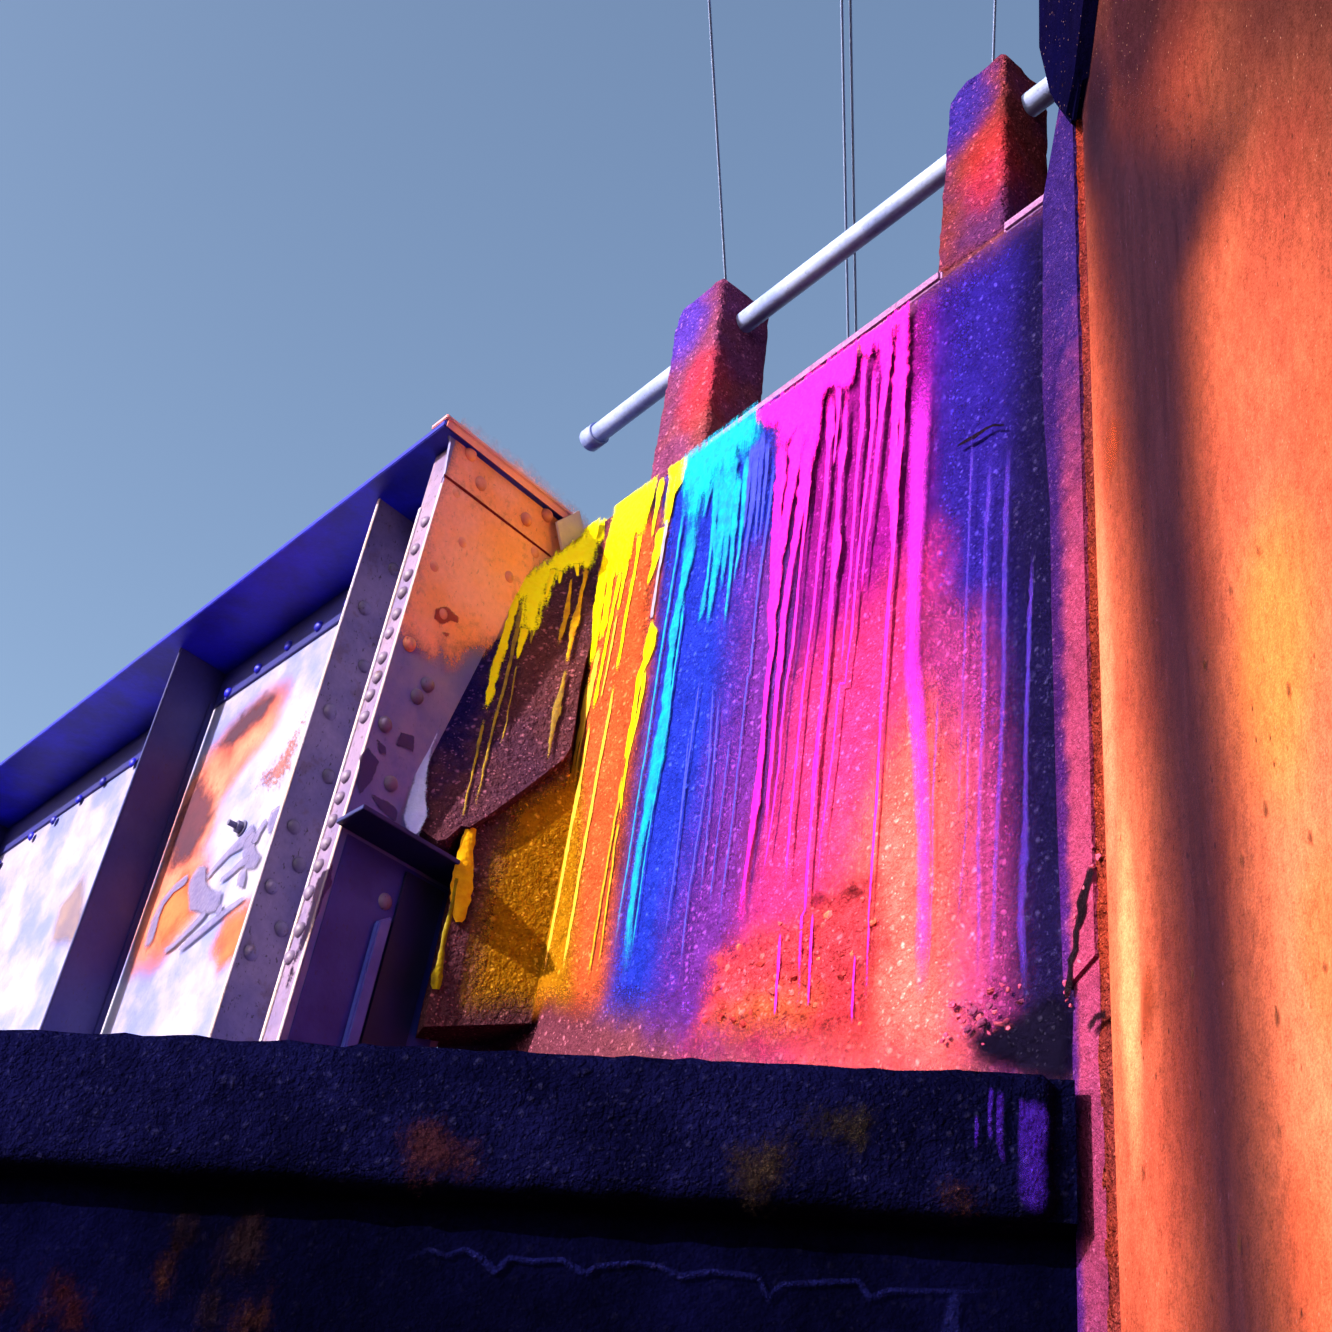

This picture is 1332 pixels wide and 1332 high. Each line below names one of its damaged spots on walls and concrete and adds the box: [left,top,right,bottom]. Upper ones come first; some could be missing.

corrosion [434,607,458,637]
corrosion [131,689,285,970]
corrosion [260,721,306,790]
crack [1062,844,1101,1008]